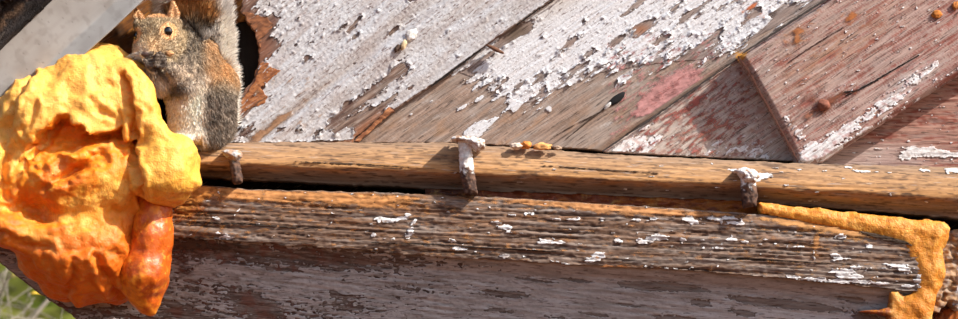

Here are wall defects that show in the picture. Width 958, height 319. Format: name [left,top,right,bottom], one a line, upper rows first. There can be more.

peeling [339,8,369,40]
peeling [736,0,829,47]
peeling [240,0,297,99]
peeling [457,0,741,138]
peeling [314,56,413,142]
peeling [233,107,256,143]
peeling [612,121,674,153]
peeling [470,212,534,233]
peeling [57,196,456,319]
peeling [470,288,529,313]